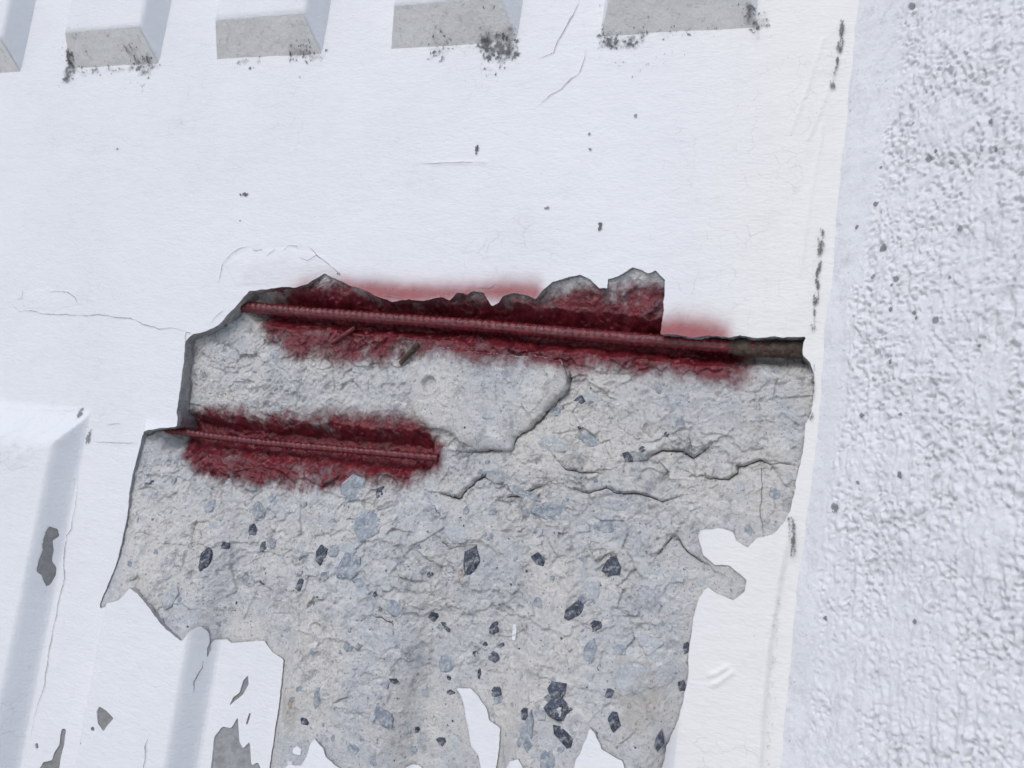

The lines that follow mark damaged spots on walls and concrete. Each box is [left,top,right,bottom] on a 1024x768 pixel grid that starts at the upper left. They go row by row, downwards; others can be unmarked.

crack [14,290,189,336]
spalling [101,268,814,768]
peeling [37,527,59,586]
peeling [92,707,113,731]
peeling [41,729,66,768]